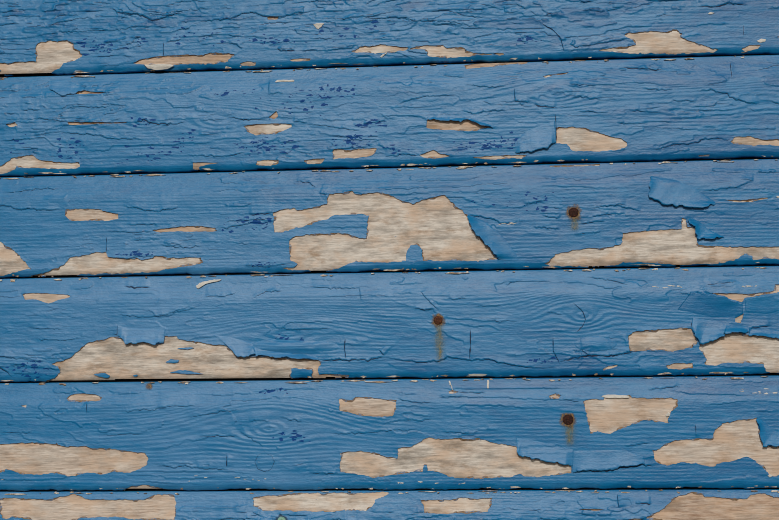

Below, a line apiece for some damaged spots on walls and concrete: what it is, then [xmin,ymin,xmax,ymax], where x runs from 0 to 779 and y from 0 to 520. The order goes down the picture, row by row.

crack [57,0,347,33]
crack [624,64,751,104]
crack [24,106,183,140]
crack [106,207,195,259]
peeling [154,191,529,277]
peeling [545,218,779,272]
peeling [2,326,400,394]
crack [324,305,636,368]
peeling [628,284,779,380]
peeling [0,442,148,480]
peeling [235,417,779,520]
crack [576,464,655,473]